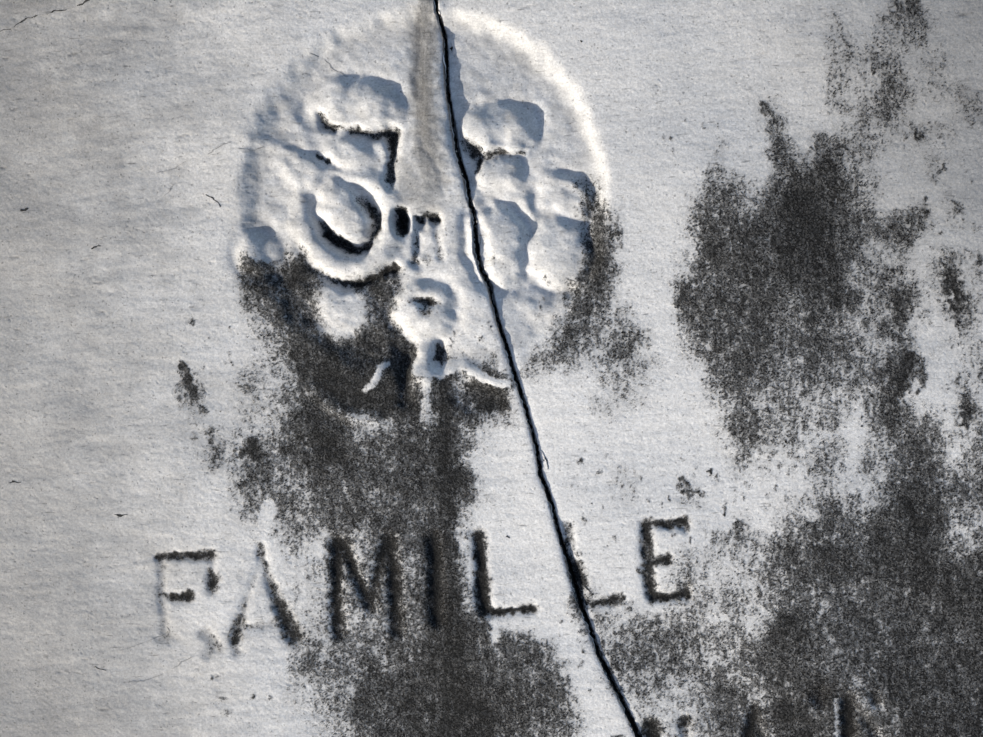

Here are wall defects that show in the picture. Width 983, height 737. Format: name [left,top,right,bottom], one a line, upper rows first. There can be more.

damp [318,112,401,190]
damp [175,174,659,737]
damp [460,137,525,174]
crack [434,0,642,737]
damp [559,0,983,737]